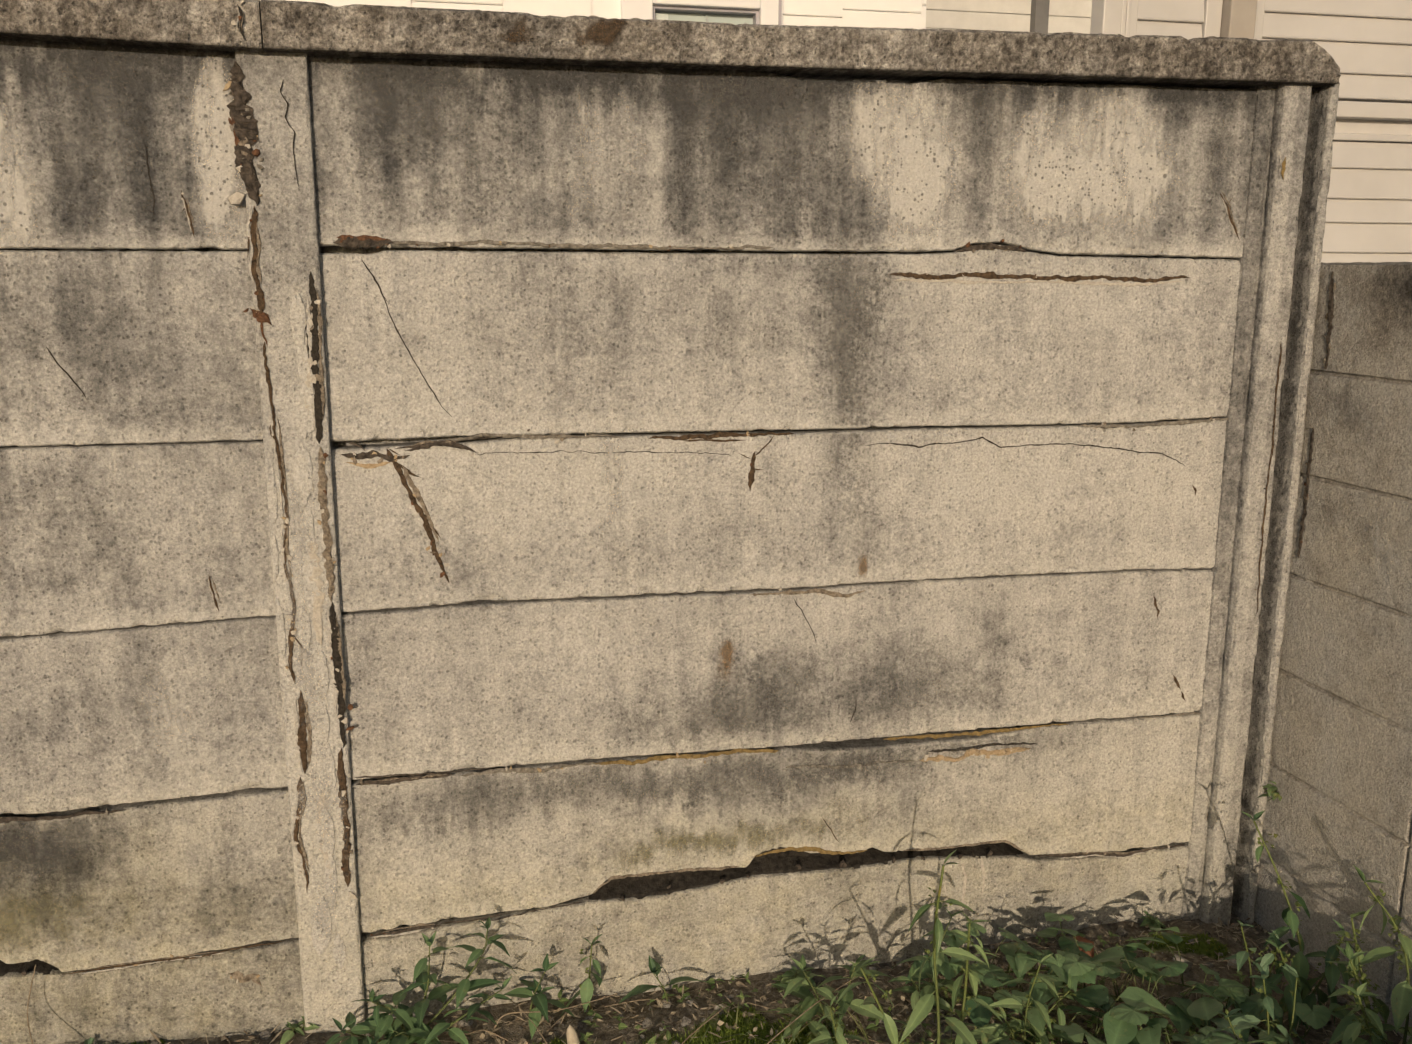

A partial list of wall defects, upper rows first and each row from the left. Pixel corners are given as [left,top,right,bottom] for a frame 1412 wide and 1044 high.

damp [0,113,34,243]
damp [194,56,240,234]
crack [280,80,299,187]
damp [851,85,953,233]
damp [1010,93,1174,231]
crack [889,271,1189,287]
crack [361,258,731,582]
crack [246,206,488,891]